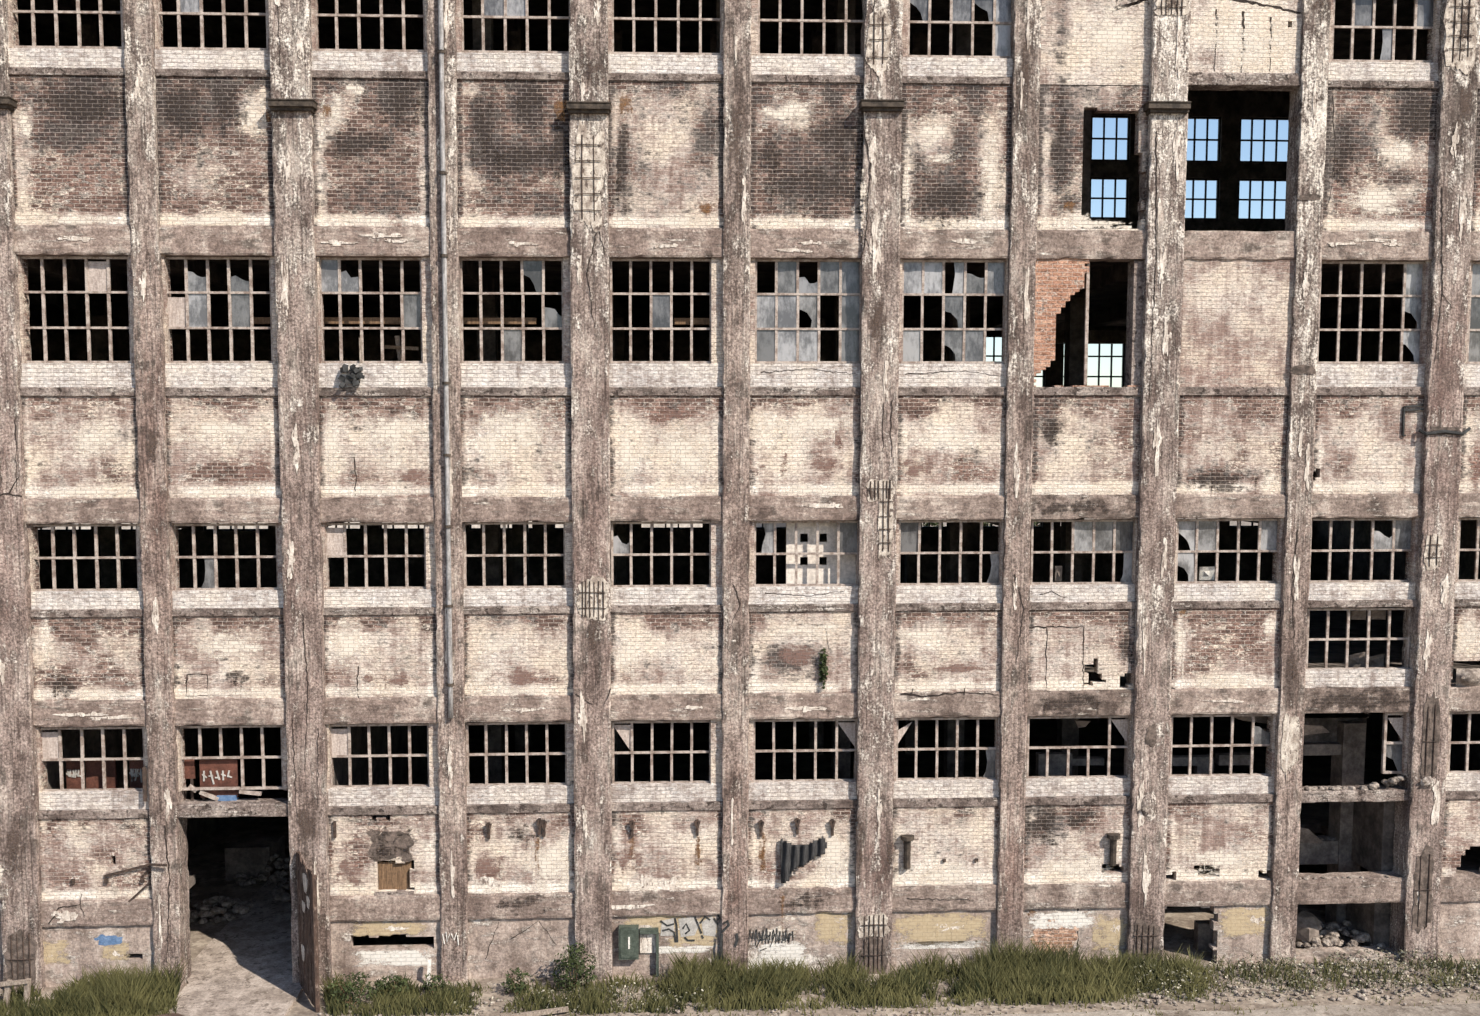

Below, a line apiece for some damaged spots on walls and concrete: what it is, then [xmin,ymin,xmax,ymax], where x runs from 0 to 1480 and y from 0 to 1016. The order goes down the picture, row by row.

water stain [729,100,868,229]
water stain [902,119,1002,230]
peeling [336,829,414,886]